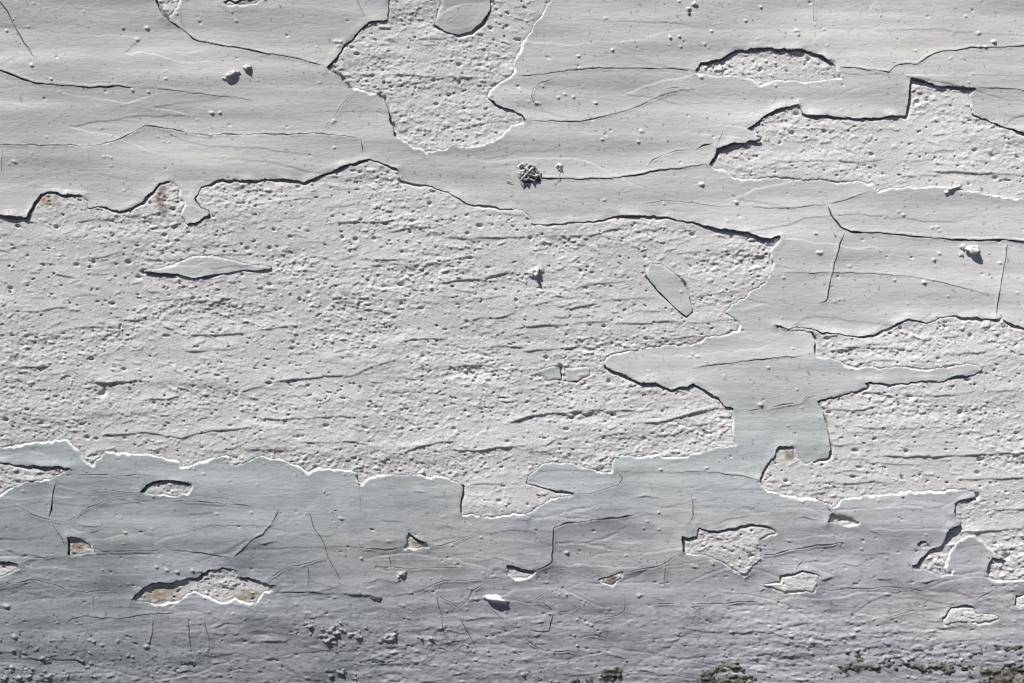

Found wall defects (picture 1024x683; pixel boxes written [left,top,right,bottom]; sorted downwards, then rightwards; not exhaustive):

crack [0,0,256,104]
crack [164,5,327,68]
peeling [325,0,551,154]
crack [515,64,698,125]
peeling [692,44,842,87]
peeling [707,75,1024,201]
crack [838,42,1024,76]
crack [539,129,1024,318]
peeling [0,155,784,519]
peeling [757,312,1024,627]
peeling [128,564,280,607]
crack [0,468,759,669]